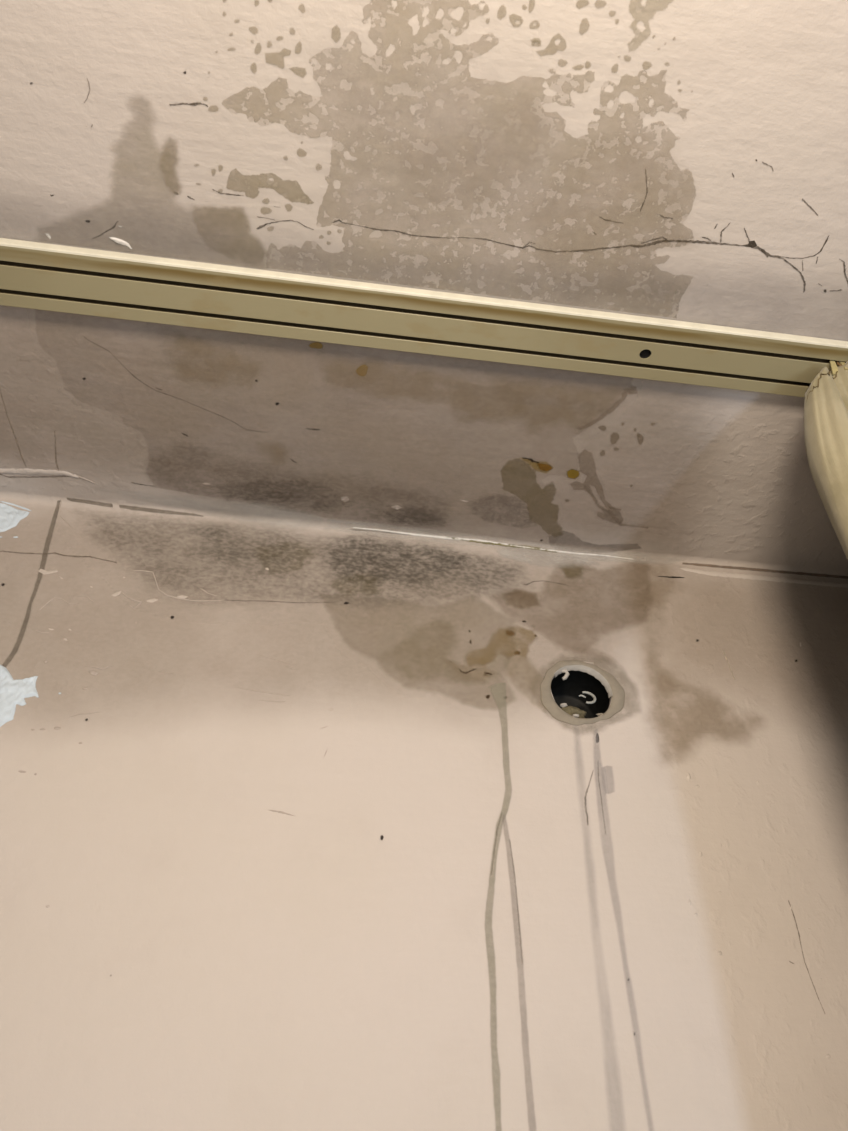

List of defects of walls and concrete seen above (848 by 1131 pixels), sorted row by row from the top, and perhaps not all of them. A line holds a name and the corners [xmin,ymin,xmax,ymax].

leakage [252,37,305,74]
leakage [213,166,313,213]
crack [333,169,848,292]
leakage [502,460,614,553]
leakage [574,423,643,526]
leakage [490,683,510,885]
leakage [486,910,496,1030]
leakage [492,1046,500,1131]